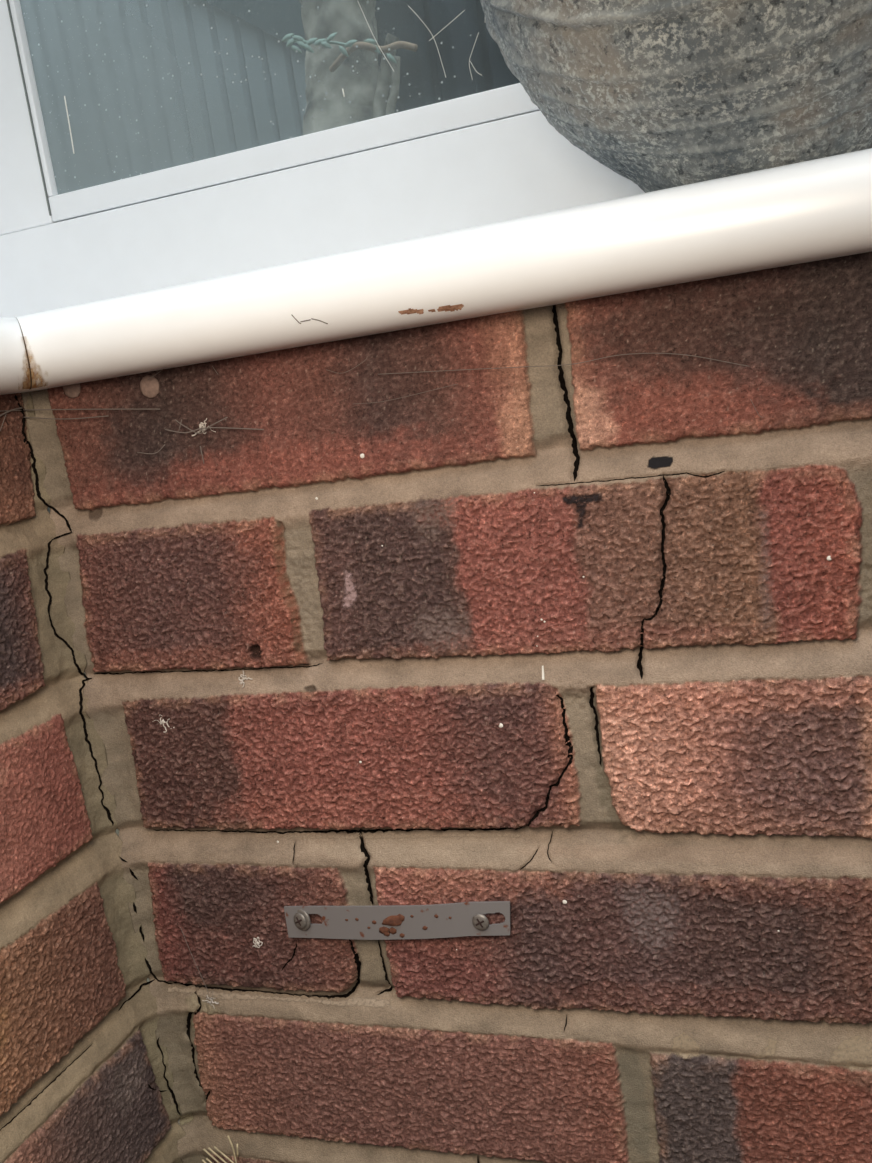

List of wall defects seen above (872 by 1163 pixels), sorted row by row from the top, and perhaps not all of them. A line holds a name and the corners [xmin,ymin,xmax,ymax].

crack [14,395,323,826]
crack [540,305,724,680]
crack [154,687,602,904]
crack [118,857,393,1116]
rust [345,914,452,938]